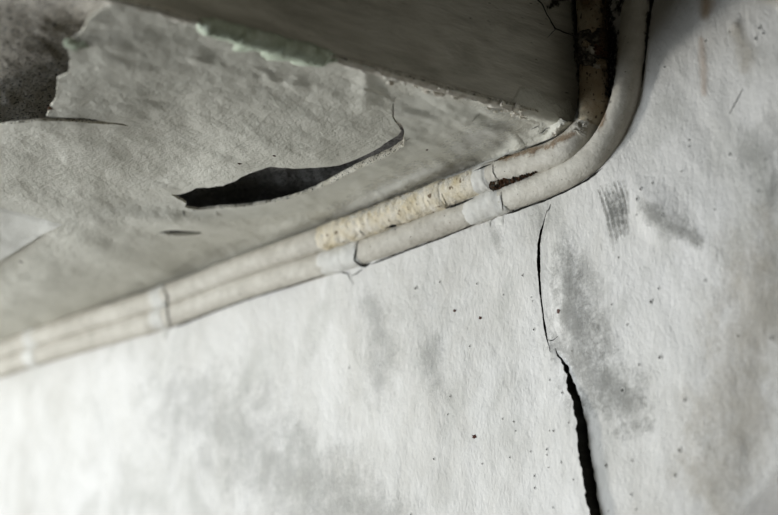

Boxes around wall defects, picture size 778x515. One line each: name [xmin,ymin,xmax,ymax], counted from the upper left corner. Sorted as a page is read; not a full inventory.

peeling [0,0,589,341]
damp [600,0,624,103]
damp [645,0,654,46]
crack [537,207,601,515]